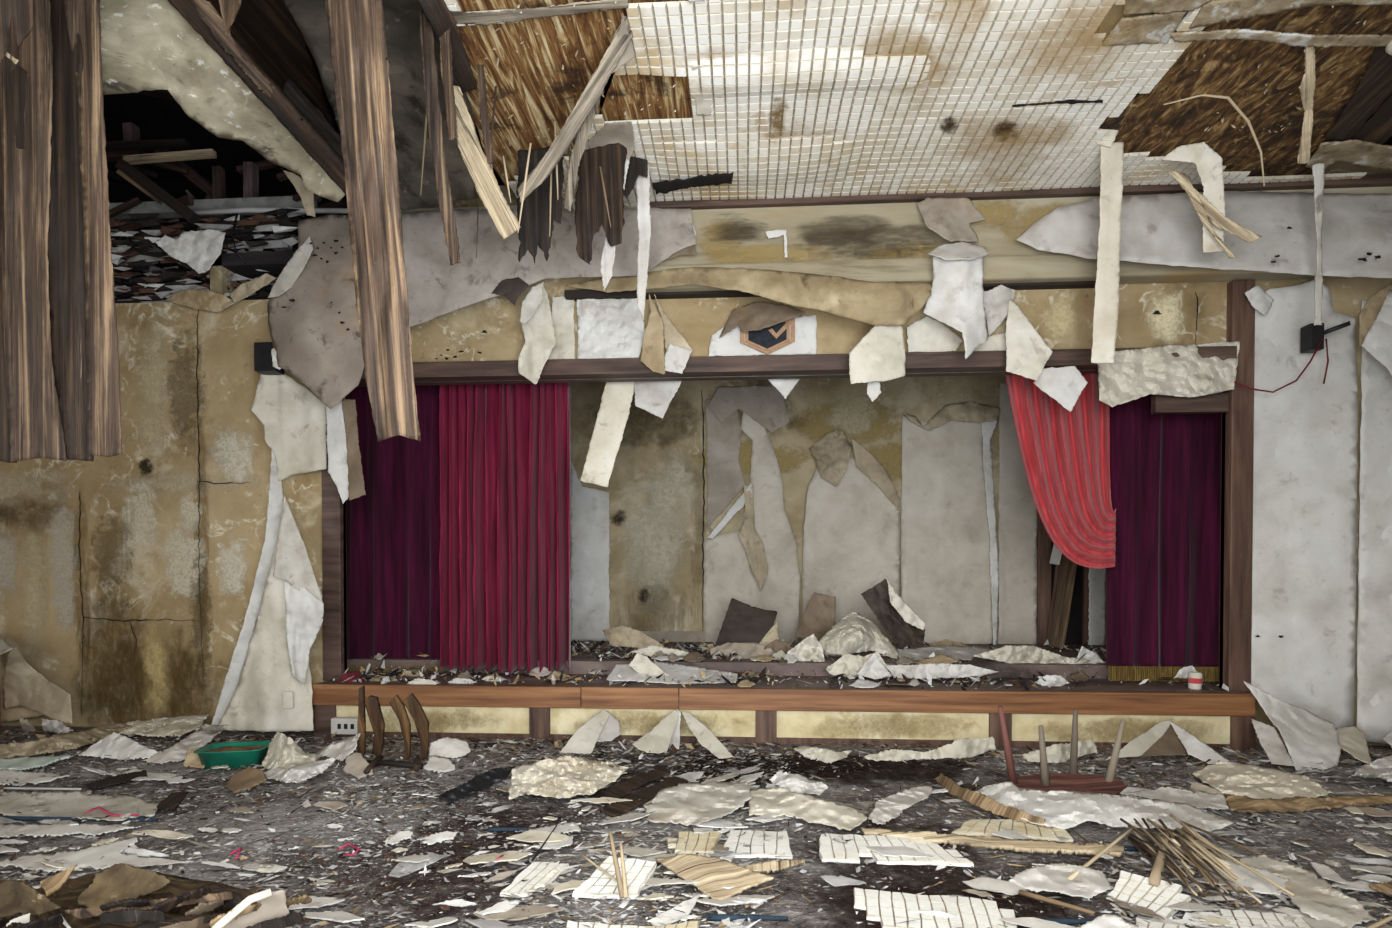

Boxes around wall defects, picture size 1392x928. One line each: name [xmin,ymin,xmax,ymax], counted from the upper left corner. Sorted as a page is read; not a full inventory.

peeling [401,208,696,327]
peeling [456,0,692,187]
damp [771,98,786,131]
damp [941,118,956,132]
damp [995,123,1016,141]
peeling [1016,197,1100,259]
peeling [1098,4,1392,375]
damp [48,498,79,630]
peeling [708,484,753,540]
peeling [981,421,999,645]
damp [82,600,209,722]